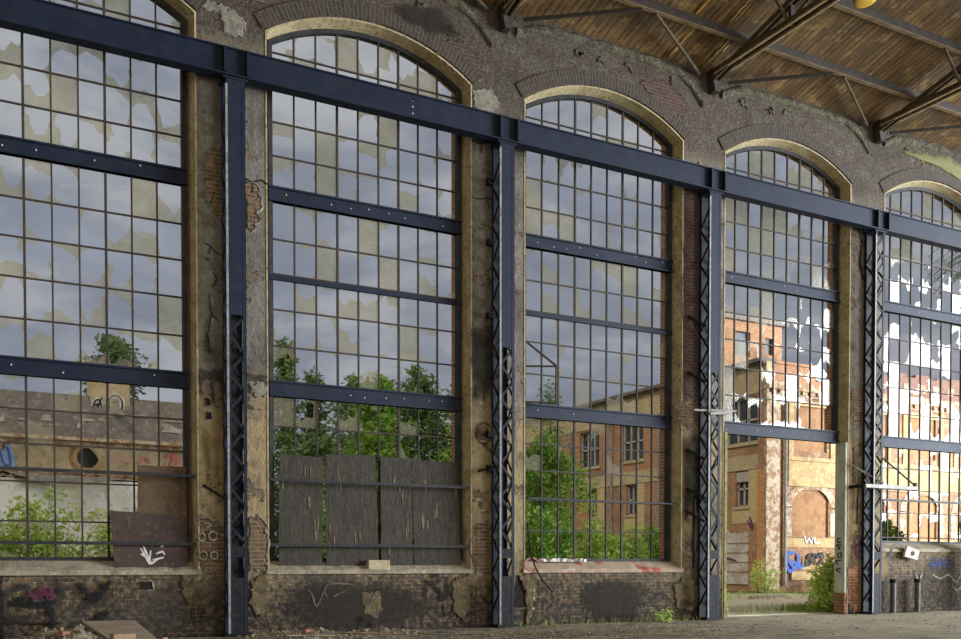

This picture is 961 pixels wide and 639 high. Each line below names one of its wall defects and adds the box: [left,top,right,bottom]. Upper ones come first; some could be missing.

flaking render [202,0,265,39]
flaking render [202,146,222,226]
flaking render [245,178,264,234]
crack [204,242,222,353]
flaking render [675,188,703,431]
flaking render [248,513,270,575]